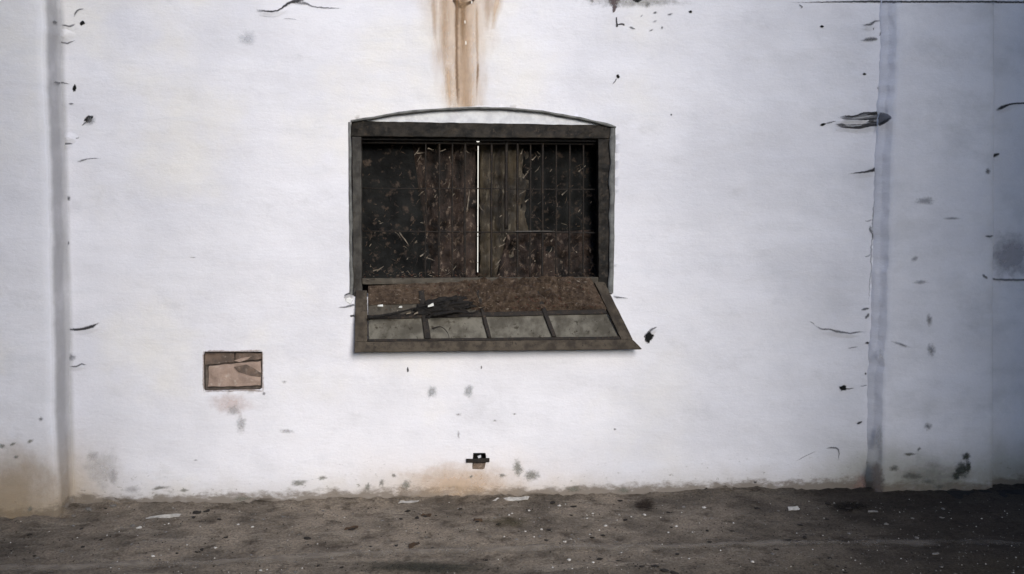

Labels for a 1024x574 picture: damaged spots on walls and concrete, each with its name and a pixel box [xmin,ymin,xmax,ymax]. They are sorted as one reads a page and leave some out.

rust [447,0,478,107]